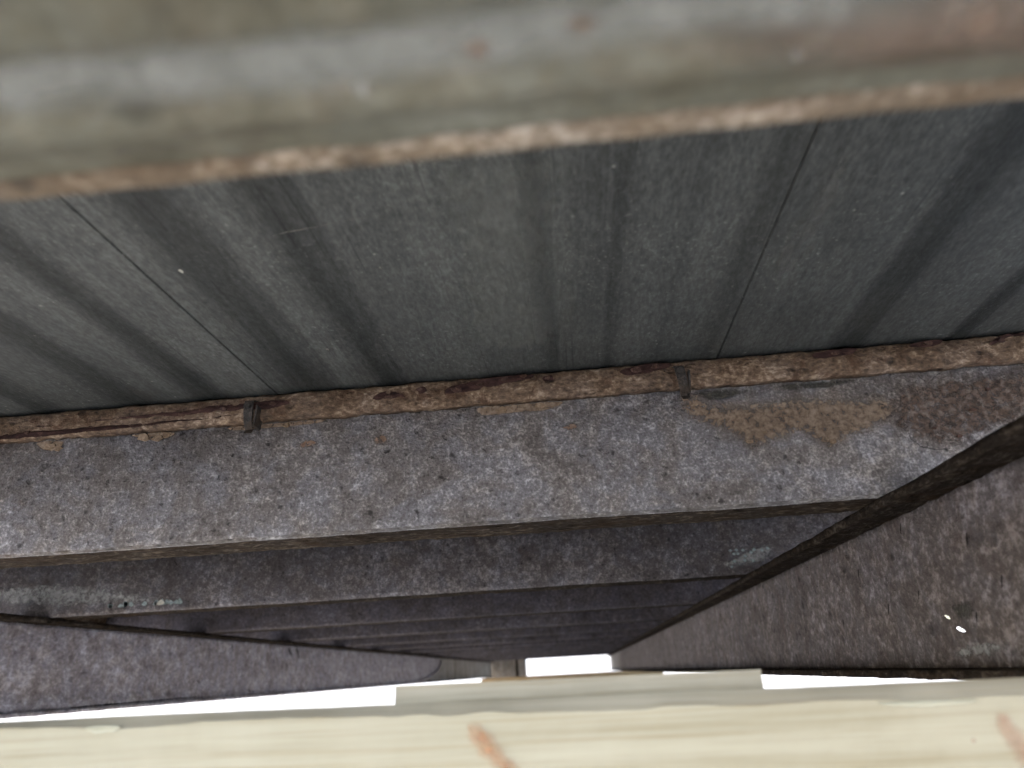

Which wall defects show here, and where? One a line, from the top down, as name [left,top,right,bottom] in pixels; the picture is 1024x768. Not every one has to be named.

corrosion [0,400,289,440]
corrosion [373,386,427,404]
corrosion [445,374,553,394]
corrosion [681,370,1024,449]